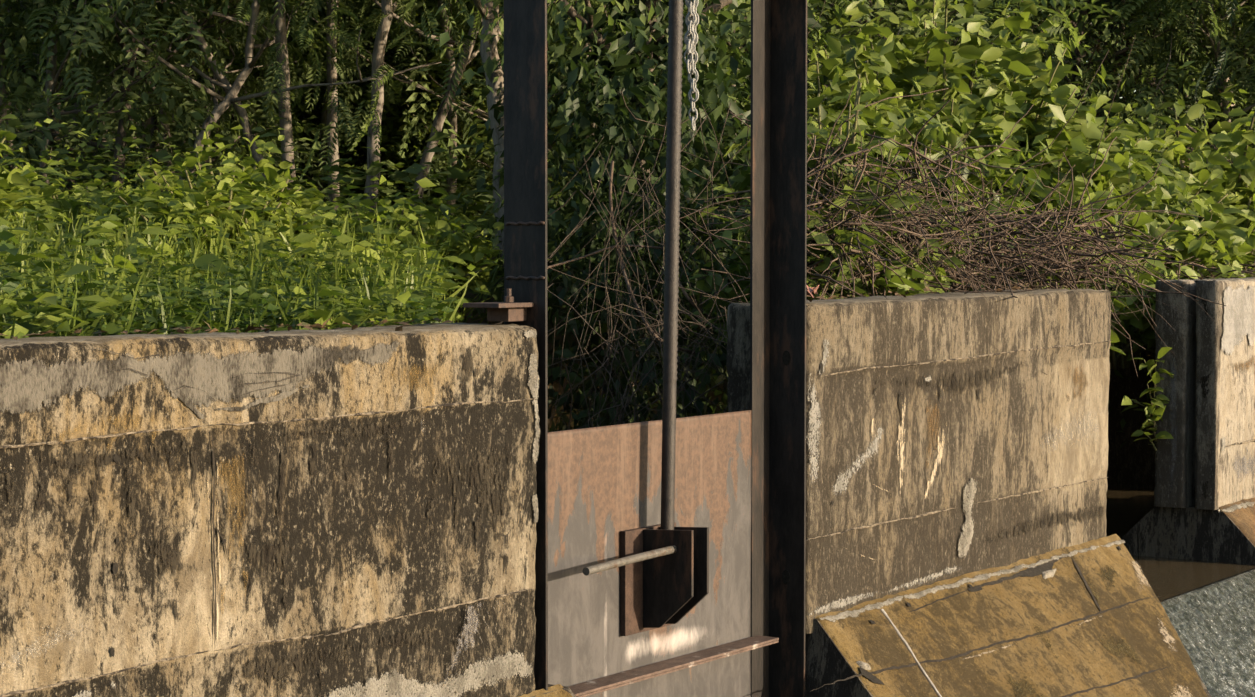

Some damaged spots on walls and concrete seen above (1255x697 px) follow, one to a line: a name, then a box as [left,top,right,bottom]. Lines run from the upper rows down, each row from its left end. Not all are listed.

peeling [1222,284,1255,355]
water stain [457,346,479,390]
water stain [806,339,830,483]
water stain [831,419,882,496]
water stain [873,362,1024,496]
water stain [26,441,200,552]
water stain [144,535,191,580]
water stain [242,420,406,613]
water stain [426,444,524,574]
water stain [980,505,1104,542]
water stain [232,628,432,697]
water stain [447,603,481,671]